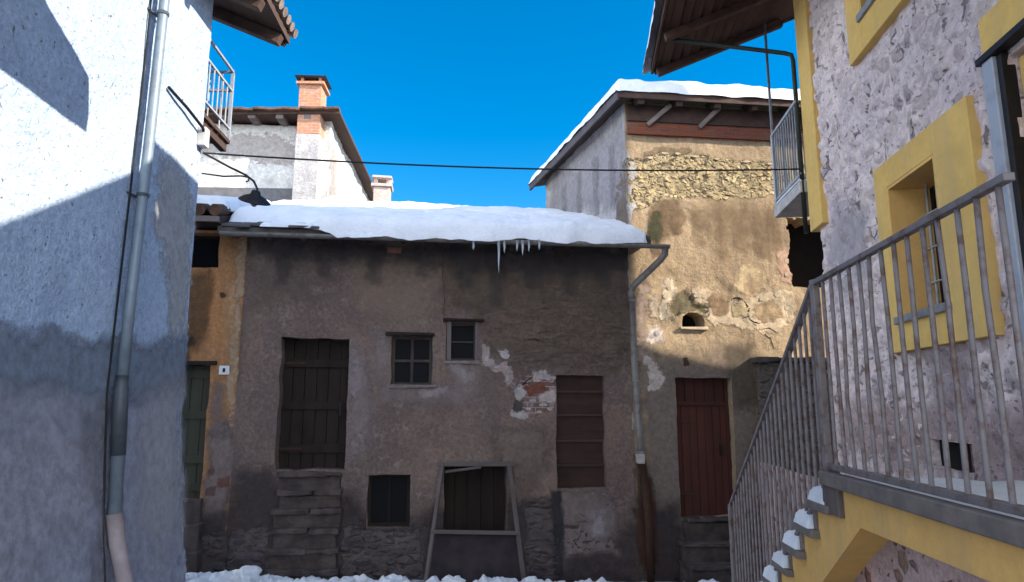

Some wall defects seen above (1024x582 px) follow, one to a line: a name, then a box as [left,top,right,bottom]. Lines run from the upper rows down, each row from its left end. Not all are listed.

flaking render [615,146,805,225]
damp [648,199,686,258]
flaking render [635,249,797,392]
damp [0,155,213,582]
flaking render [481,343,556,421]